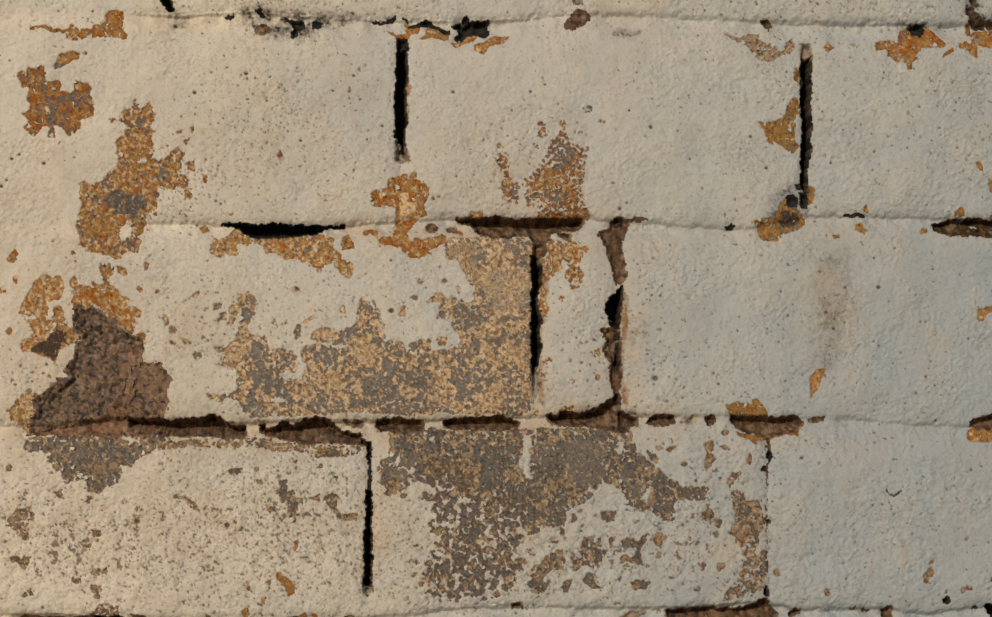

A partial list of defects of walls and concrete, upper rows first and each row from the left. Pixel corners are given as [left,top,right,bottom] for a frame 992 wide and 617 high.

peeling [17,10,128,138]
peeling [875,24,992,73]
peeling [754,183,817,242]
peeling [1,97,801,603]
peeling [810,369,826,398]
peeling [72,566,121,617]
peeling [923,560,935,584]
peeling [942,585,973,604]